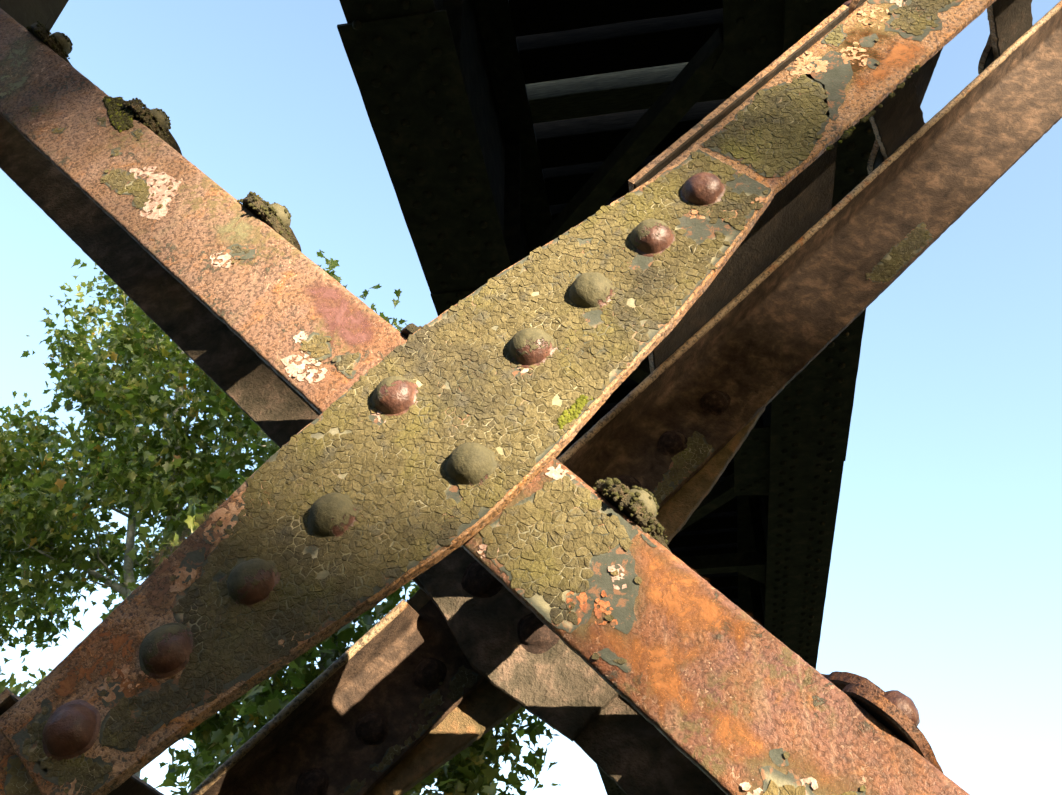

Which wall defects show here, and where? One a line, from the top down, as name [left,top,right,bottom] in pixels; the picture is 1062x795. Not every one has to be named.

peeling [97,0,964,752]
rust [648,557,750,640]
rust [50,626,173,702]
rust [606,633,694,708]
peeling [4,698,113,795]
rust [716,714,764,755]
peeling [740,748,866,795]